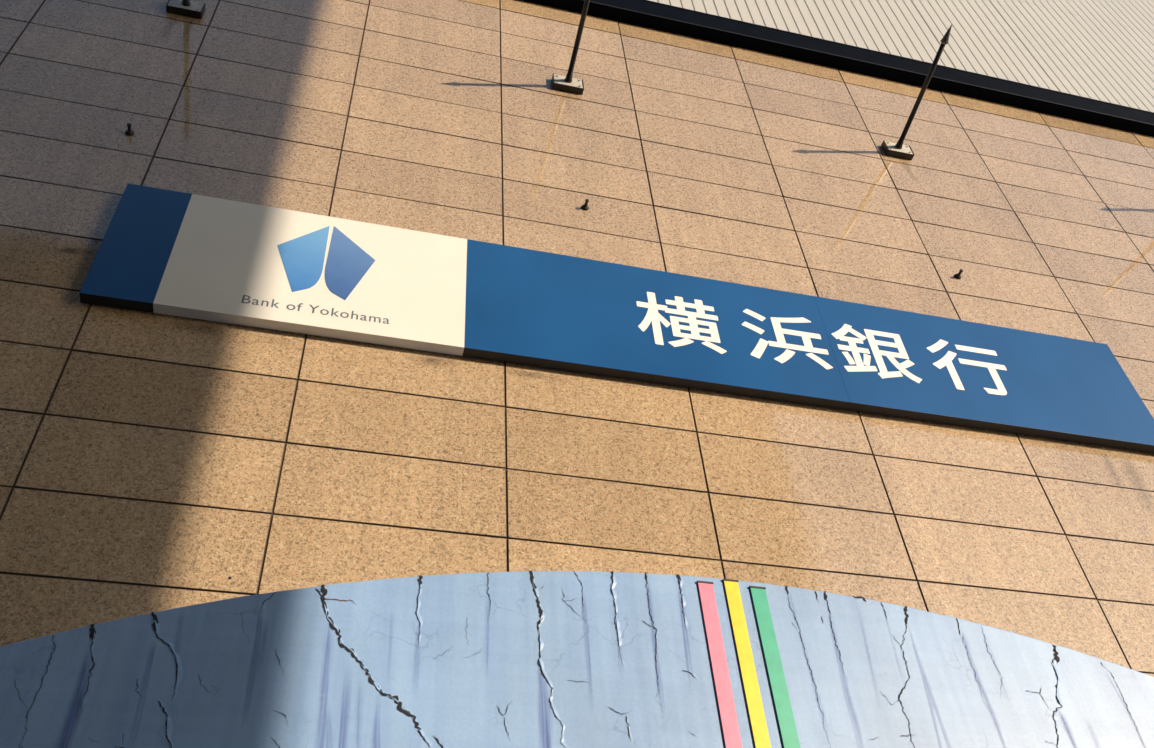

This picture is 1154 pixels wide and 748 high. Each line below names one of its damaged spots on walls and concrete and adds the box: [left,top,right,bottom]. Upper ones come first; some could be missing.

crack [14,635,56,748]
crack [77,624,124,748]
crack [135,611,219,748]
crack [316,585,443,748]
crack [415,572,491,660]
crack [529,570,698,748]
crack [956,618,1063,748]